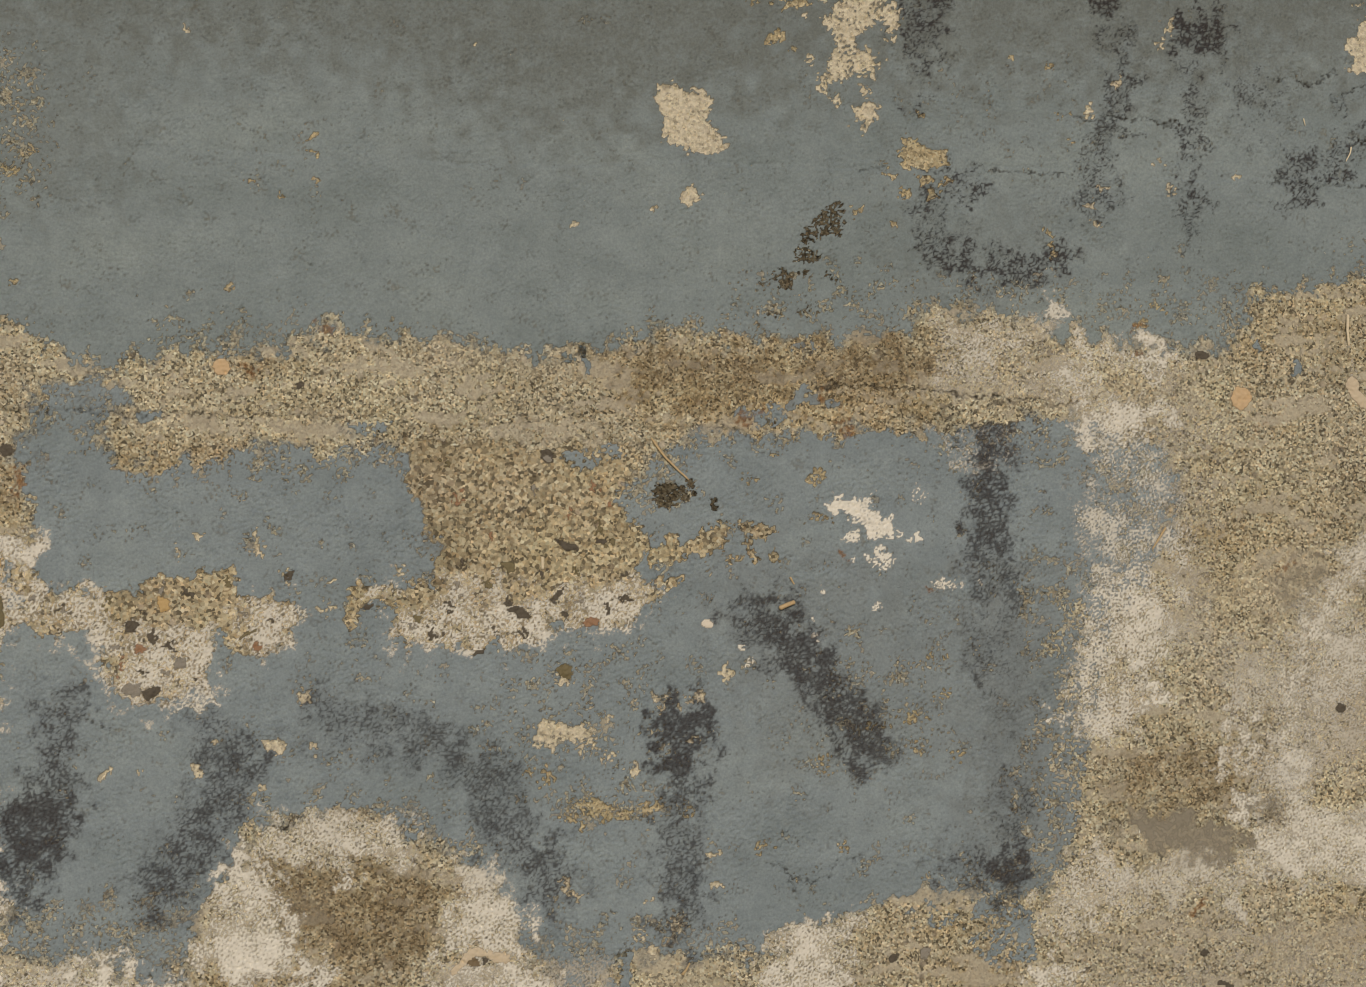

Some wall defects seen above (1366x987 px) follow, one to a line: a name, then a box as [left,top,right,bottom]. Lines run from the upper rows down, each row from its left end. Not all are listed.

peeling [654,79,730,155]
peeling [750,0,903,136]
peeling [1344,2,1366,75]
spalling [759,201,864,291]
peeling [0,527,299,707]
water stain [0,517,307,729]
peeling [315,432,781,655]
water stain [738,596,890,782]
water stain [909,156,1212,747]
water stain [905,533,1366,987]
water stain [0,733,424,987]
water stain [423,810,609,987]